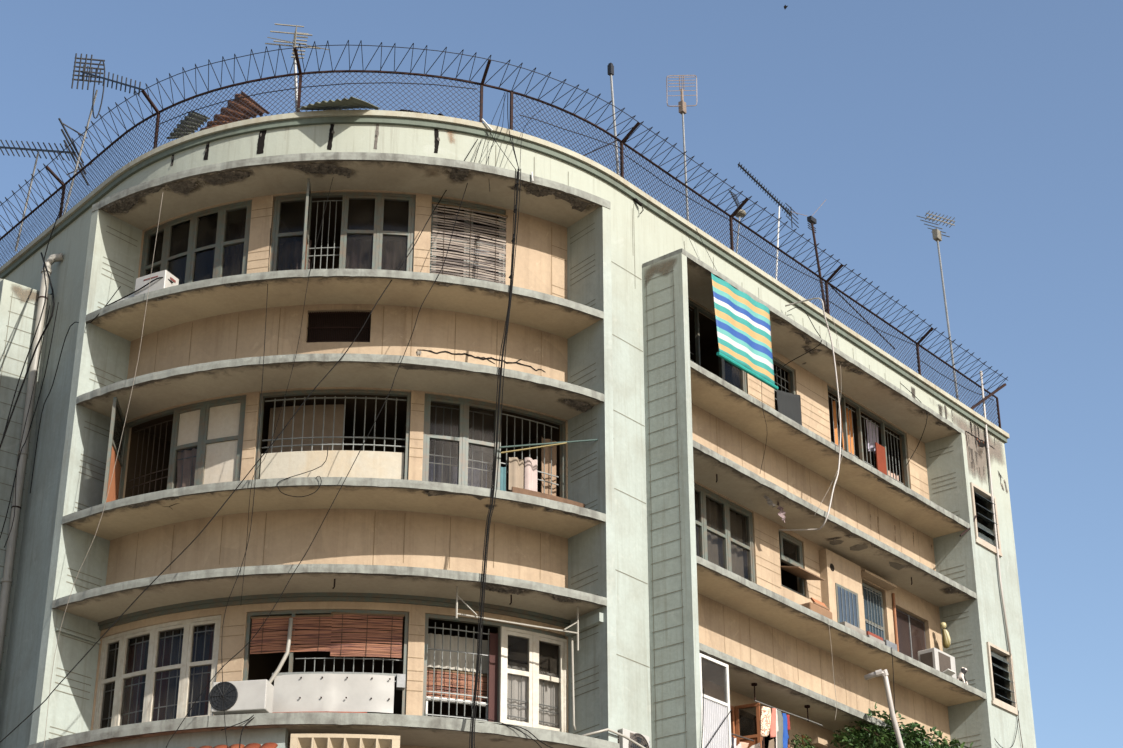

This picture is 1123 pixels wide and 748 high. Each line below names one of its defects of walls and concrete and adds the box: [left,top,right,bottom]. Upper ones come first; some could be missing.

spalling [293,162,352,178]
spalling [102,171,252,213]
spalling [510,181,595,212]
crack [422,350,545,372]
water stain [938,405,1002,482]